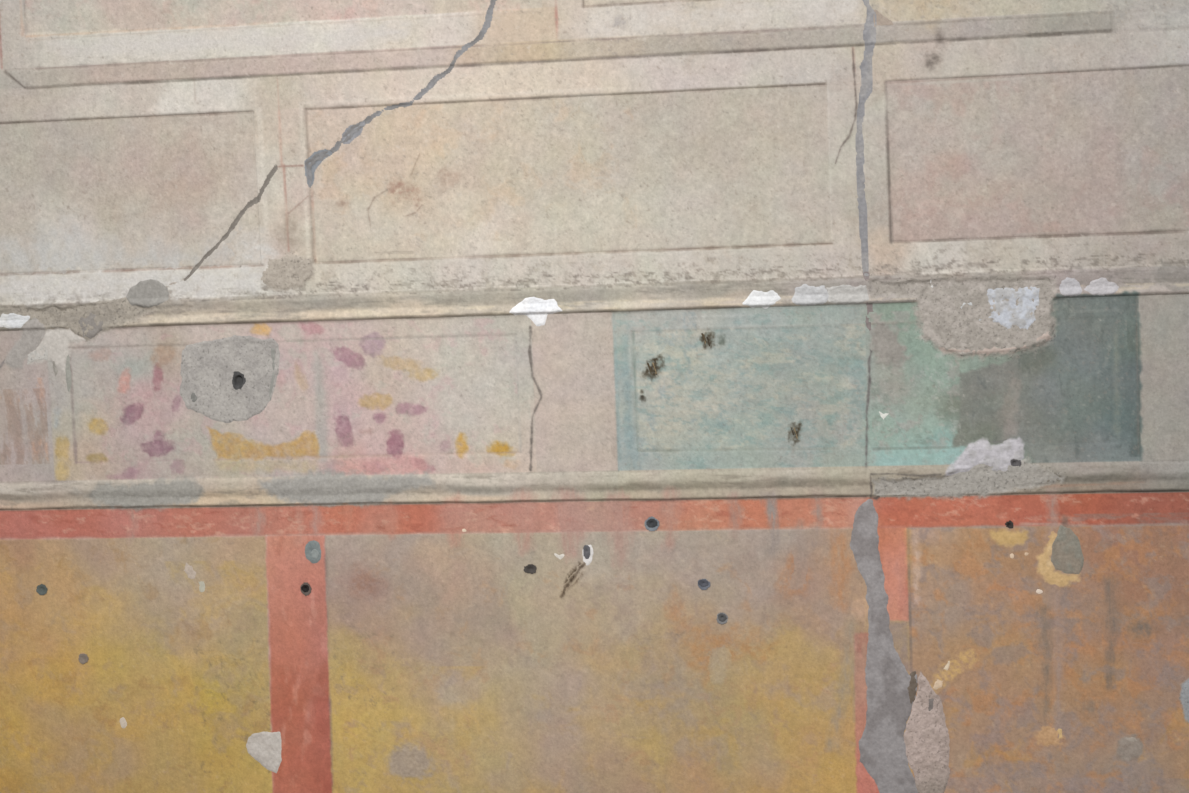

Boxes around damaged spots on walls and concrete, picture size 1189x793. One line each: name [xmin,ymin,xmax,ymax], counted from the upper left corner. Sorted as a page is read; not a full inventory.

crack [166,0,497,288]
crack [834,0,942,501]
spalling [0,279,169,392]
flaking render [509,297,562,326]
spalling [742,272,1119,363]
crack [527,325,544,472]
spalling [868,435,1068,502]
spalling [987,513,1084,588]
flaking render [904,646,981,793]